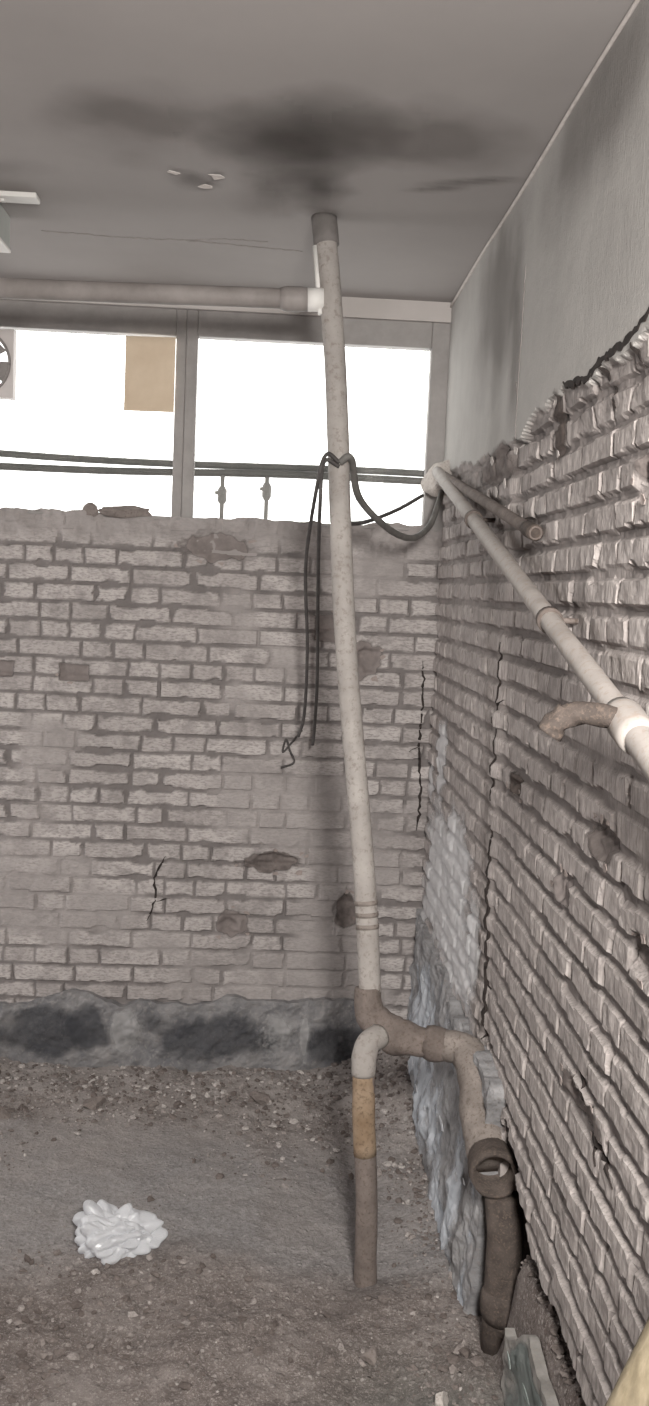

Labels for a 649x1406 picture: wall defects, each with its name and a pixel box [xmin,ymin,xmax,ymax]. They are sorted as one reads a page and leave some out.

spalling [553,392,567,461]
spalling [481,442,519,497]
spalling [630,454,649,505]
spalling [506,772,525,804]
crack [146,856,170,921]
spalling [235,849,309,875]
crack [481,642,504,1039]
spalling [550,864,574,906]
spalling [587,813,620,873]
spalling [631,931,649,990]
spalling [559,1063,601,1142]